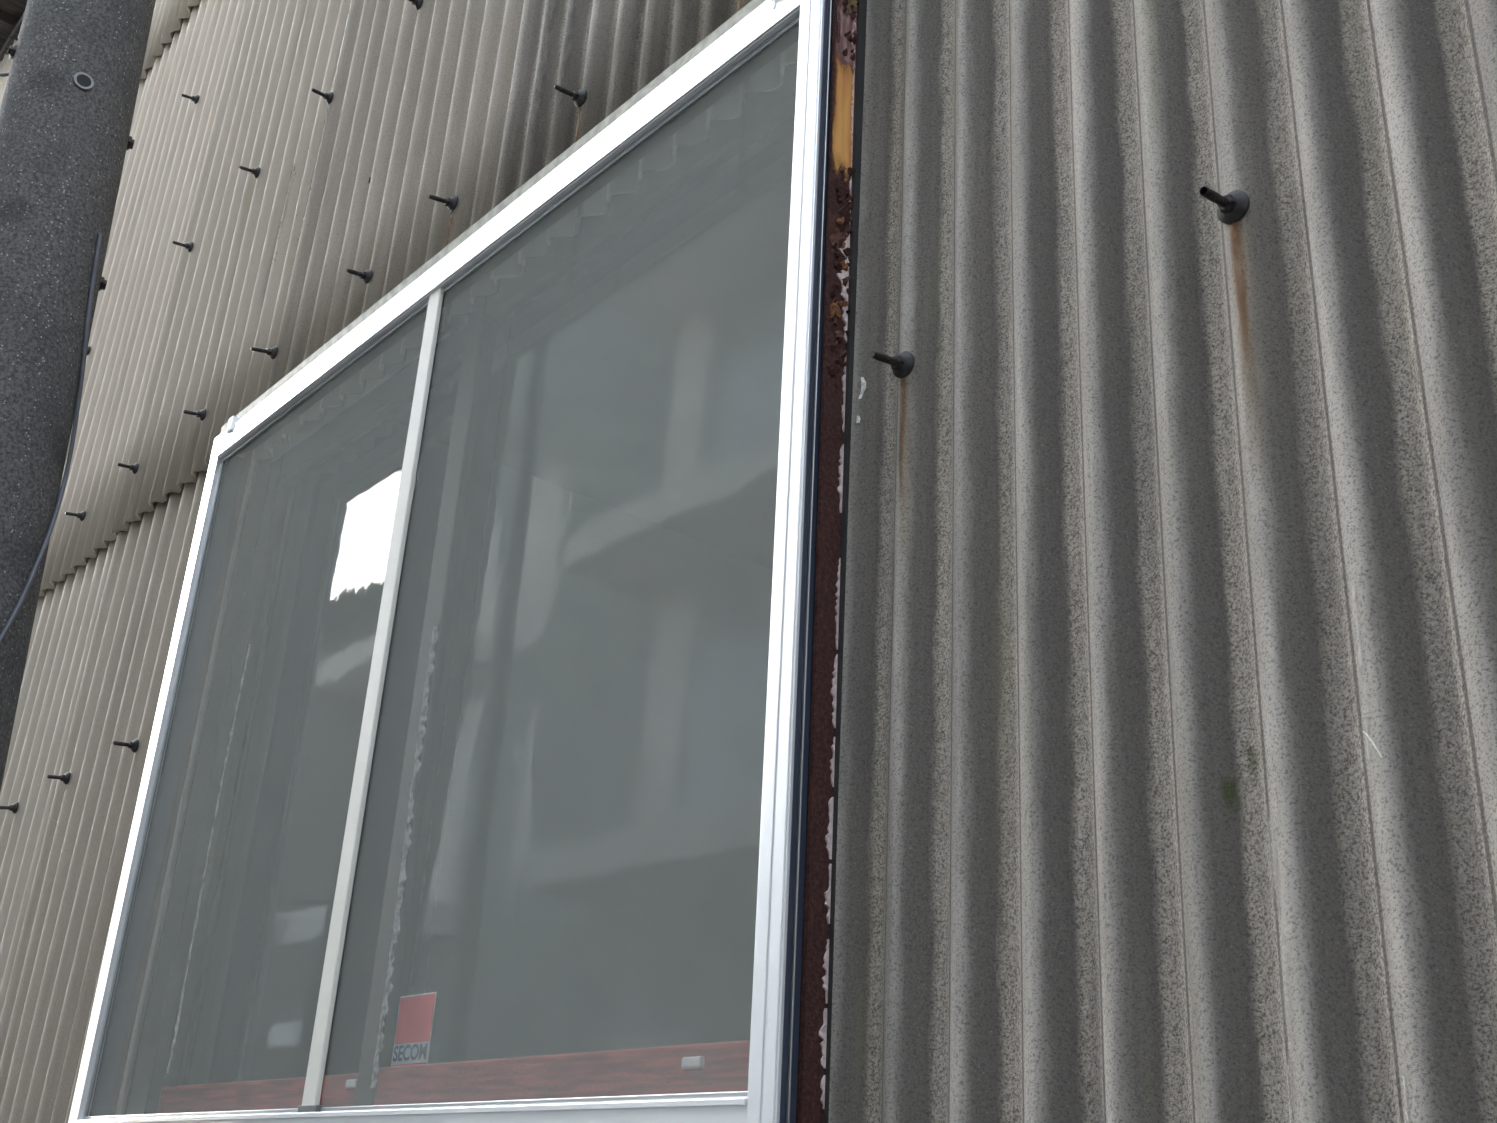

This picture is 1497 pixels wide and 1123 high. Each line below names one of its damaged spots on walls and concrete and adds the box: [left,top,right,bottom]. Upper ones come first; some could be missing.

rust [827,0,860,376]
peeling [837,13,857,513]
rust [1231,221,1248,356]
peeling [819,558,841,1109]